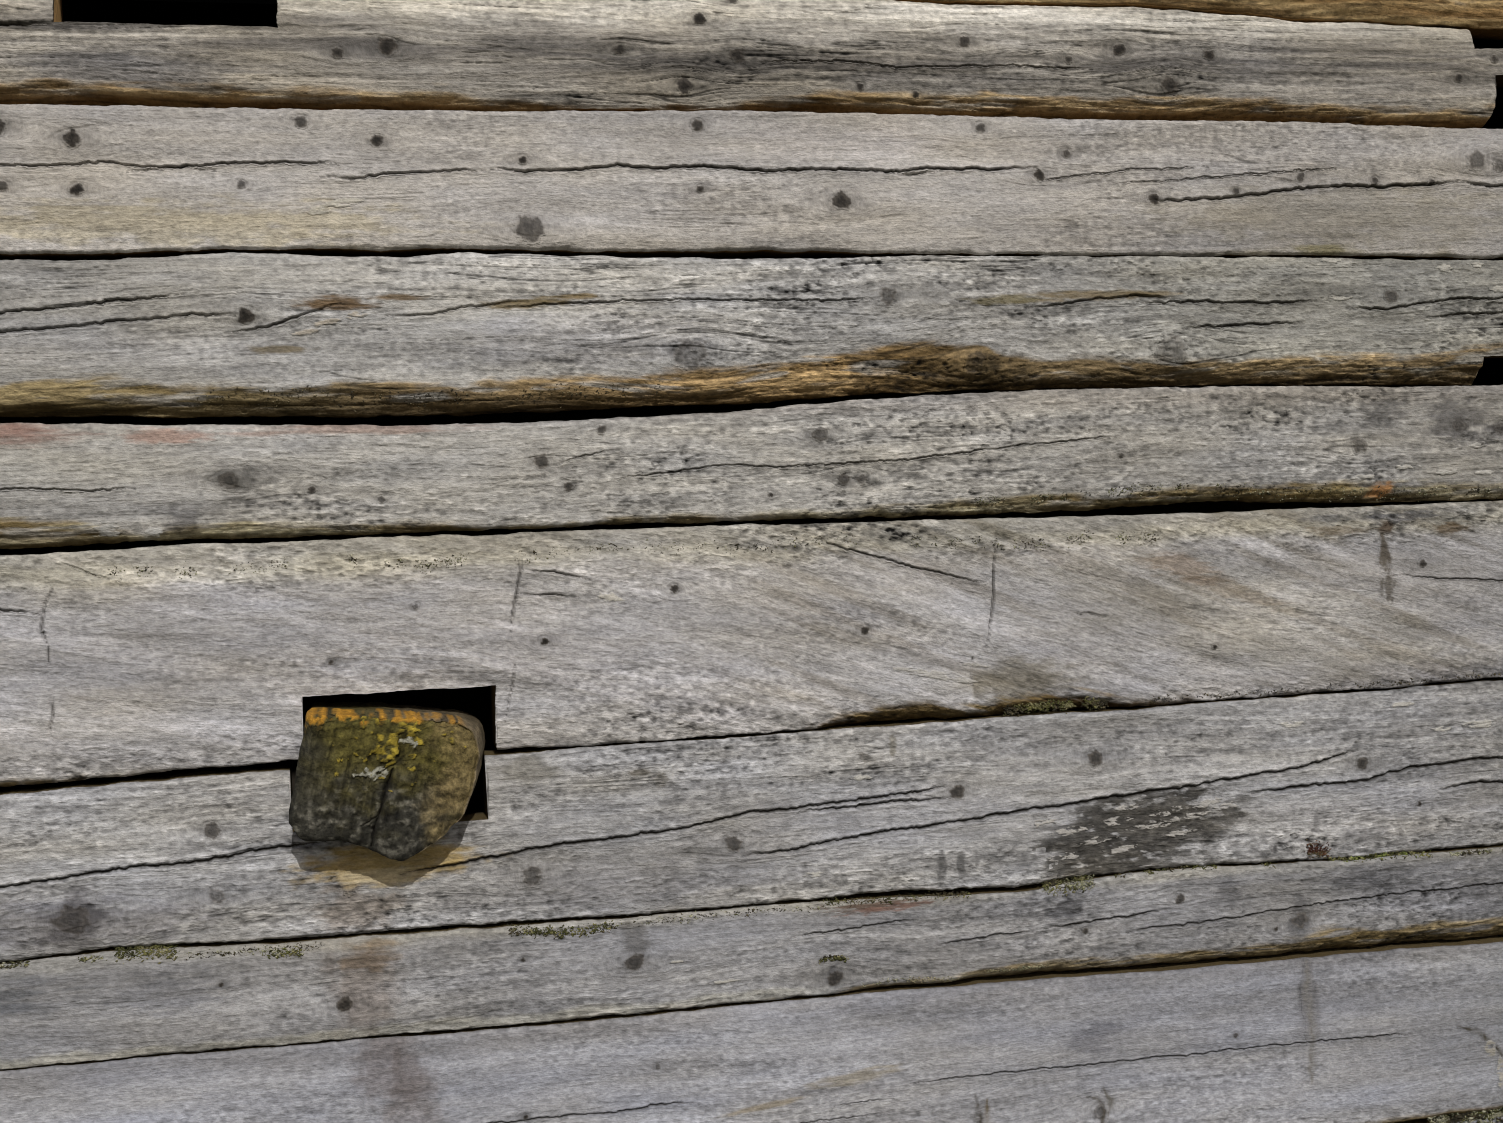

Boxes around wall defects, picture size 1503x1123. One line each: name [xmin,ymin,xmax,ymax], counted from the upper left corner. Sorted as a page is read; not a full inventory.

crack [0,159,1503,203]
crack [0,292,345,334]
crack [382,297,877,318]
crack [1025,293,1503,331]
crack [0,732,1503,890]
damp [277,836,514,1123]